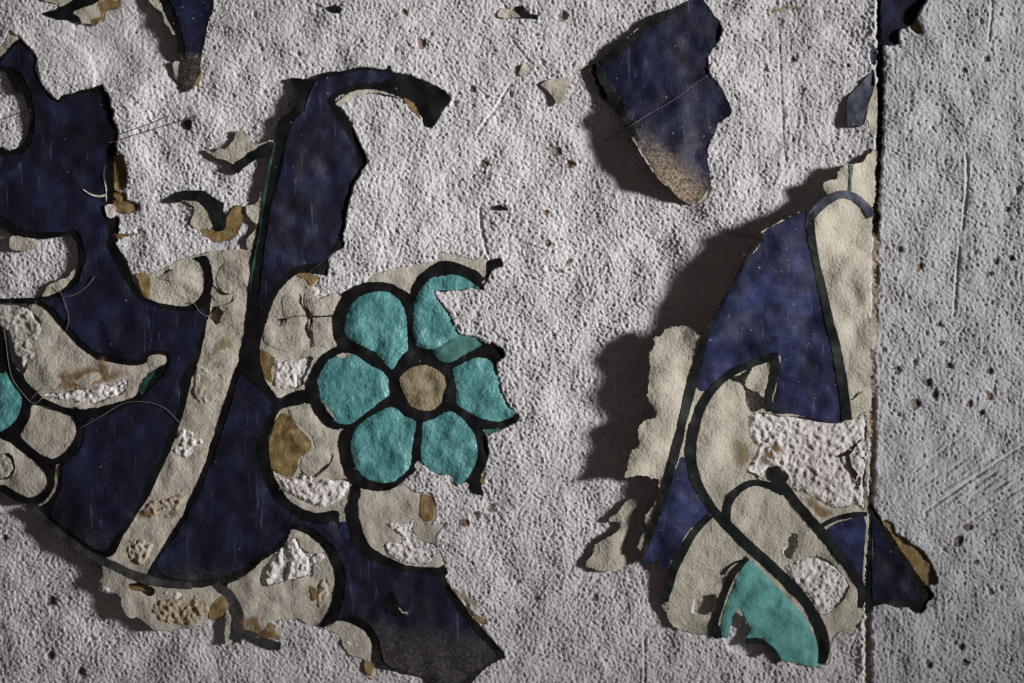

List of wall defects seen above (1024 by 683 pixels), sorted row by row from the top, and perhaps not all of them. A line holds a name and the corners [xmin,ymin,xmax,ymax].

peeling [44,0,121,25]
peeling [149,0,214,92]
peeling [516,6,537,19]
peeling [541,78,570,105]
peeling [586,0,730,204]
spalling [552,145,575,168]
crack [871,0,885,318]
peeling [0,31,519,683]
peeling [586,149,938,667]
crack [837,348,876,499]
crack [864,619,872,683]